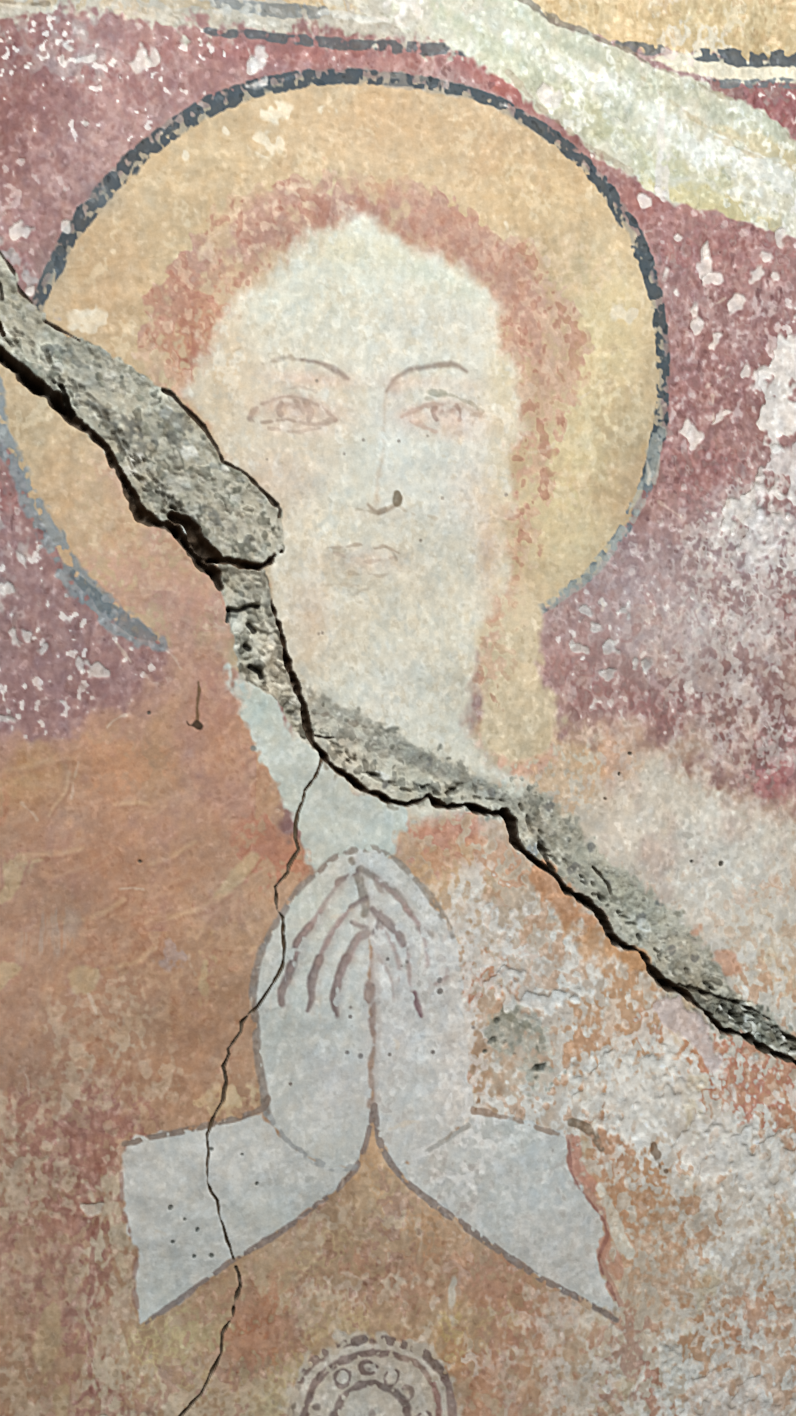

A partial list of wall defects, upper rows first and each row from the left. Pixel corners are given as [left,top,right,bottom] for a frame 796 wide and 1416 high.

peeling [63,43,97,64]
peeling [129,43,161,75]
peeling [246,45,269,89]
peeling [537,84,553,106]
peeling [637,183,668,209]
peeling [10,220,35,241]
peeling [62,220,72,234]
peeling [696,229,786,316]
crack [0,252,284,592]
flaking render [0,255,796,1230]
crack [179,600,796,1416]
peeling [661,1345,796,1416]